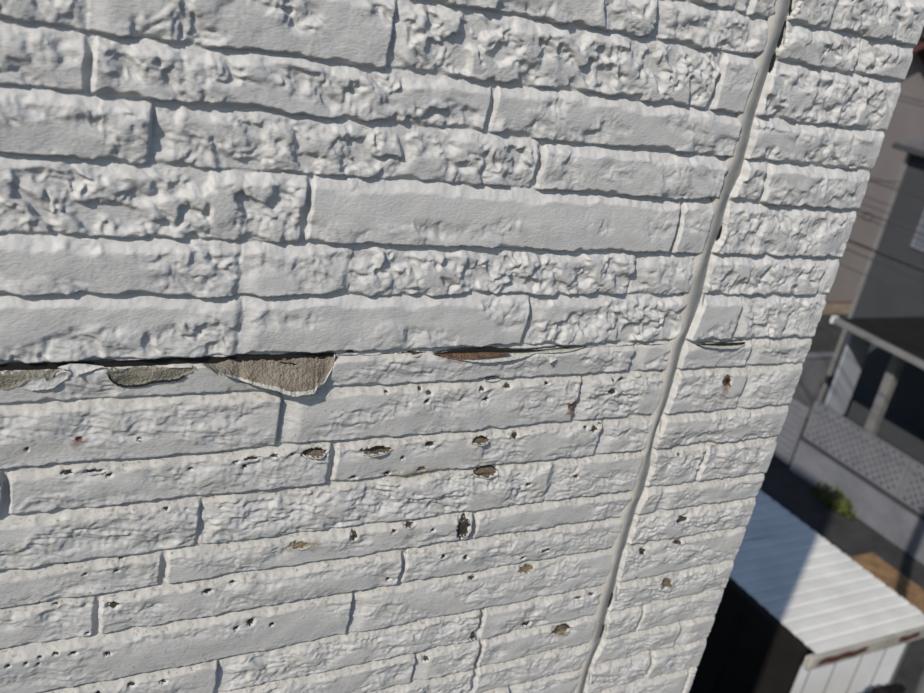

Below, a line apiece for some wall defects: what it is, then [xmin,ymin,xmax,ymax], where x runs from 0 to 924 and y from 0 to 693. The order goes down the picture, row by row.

peeling [696,341,745,349]
peeling [433,346,585,363]
peeling [0,350,354,397]
spalling [472,435,489,446]
spalling [300,447,327,459]
spalling [360,446,393,457]
spalling [473,465,499,479]
spalling [456,513,472,540]
spalling [551,623,572,636]